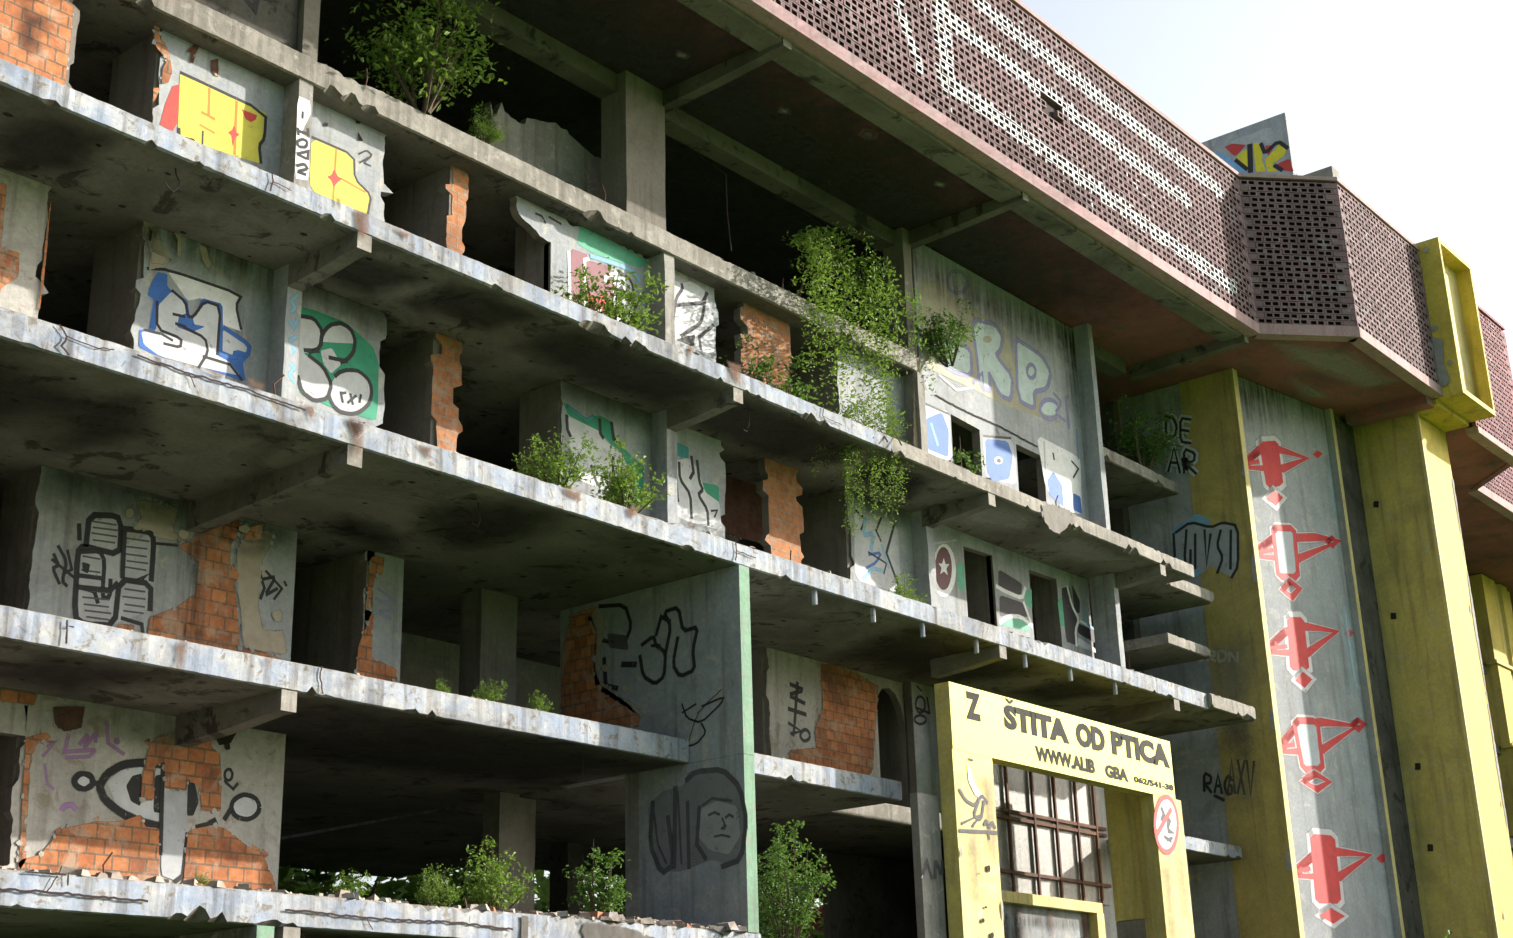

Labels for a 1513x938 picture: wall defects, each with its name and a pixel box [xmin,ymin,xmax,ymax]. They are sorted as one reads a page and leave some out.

flaking render [0,0,74,86]
flaking render [0,180,20,290]
flaking render [39,202,51,309]
flaking render [117,501,288,660]
spalling [0,659,639,890]
flaking render [353,556,399,682]
flaking render [560,605,644,728]
flaking render [788,664,879,775]
spalling [707,924,732,937]